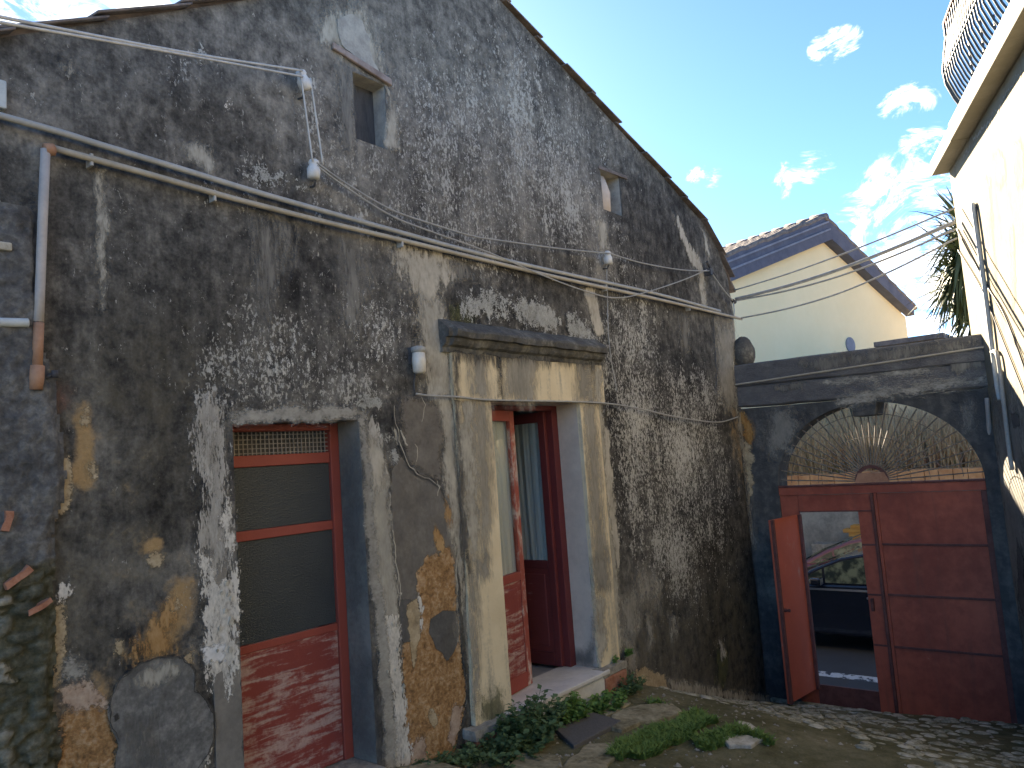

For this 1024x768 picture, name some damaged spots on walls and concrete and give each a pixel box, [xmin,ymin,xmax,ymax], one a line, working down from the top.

damp [95,172,110,307]
damp [252,218,293,319]
peeling [55,455,73,521]
spalling [187,285,470,767]
damp [389,244,770,720]
peeling [53,582,118,768]